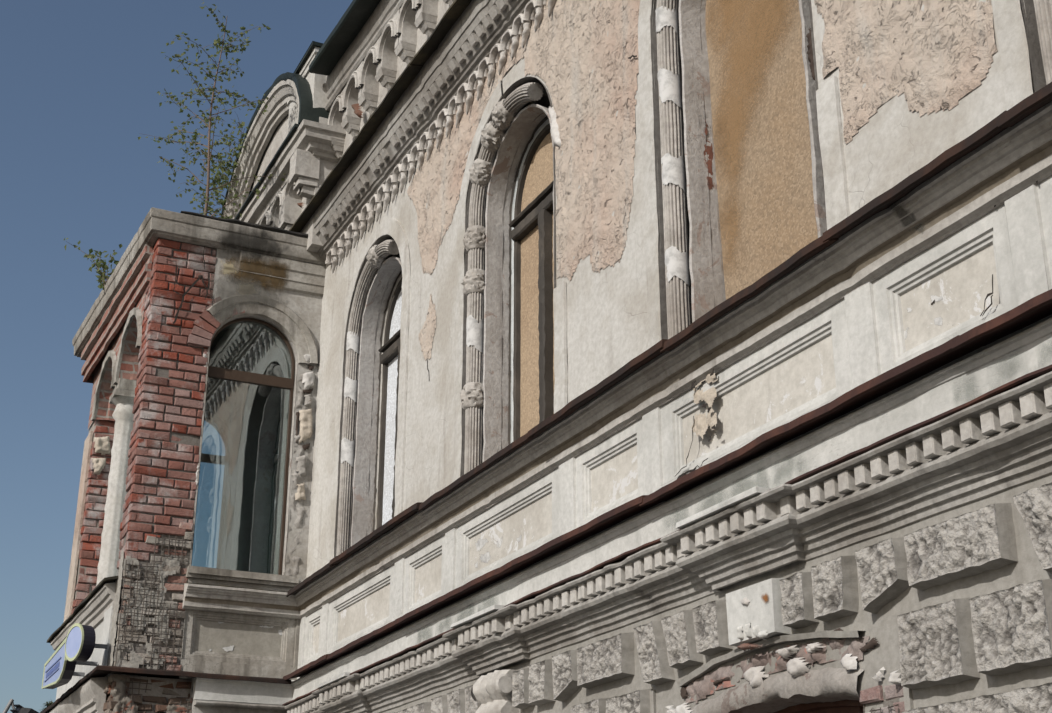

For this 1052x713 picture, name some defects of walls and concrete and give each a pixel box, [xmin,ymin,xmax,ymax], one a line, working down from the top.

spalling [407,0,640,281]
spalling [806,0,998,144]
damp [209,229,288,319]
crack [980,274,993,316]
spalling [691,368,718,439]
spalling [103,551,193,713]